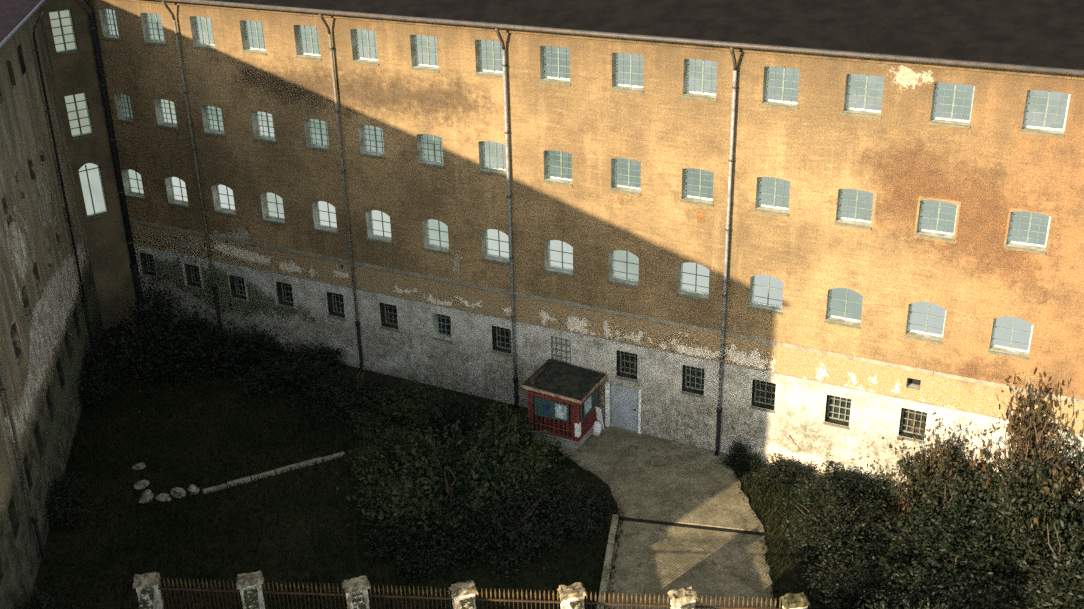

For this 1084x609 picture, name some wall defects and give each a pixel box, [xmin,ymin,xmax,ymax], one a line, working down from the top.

flaking render [889,65,934,90]
flaking render [212,239,351,278]
flaking render [392,284,483,309]
water stain [5,208,97,489]
flaking render [538,309,777,373]
flaking render [841,372,901,425]